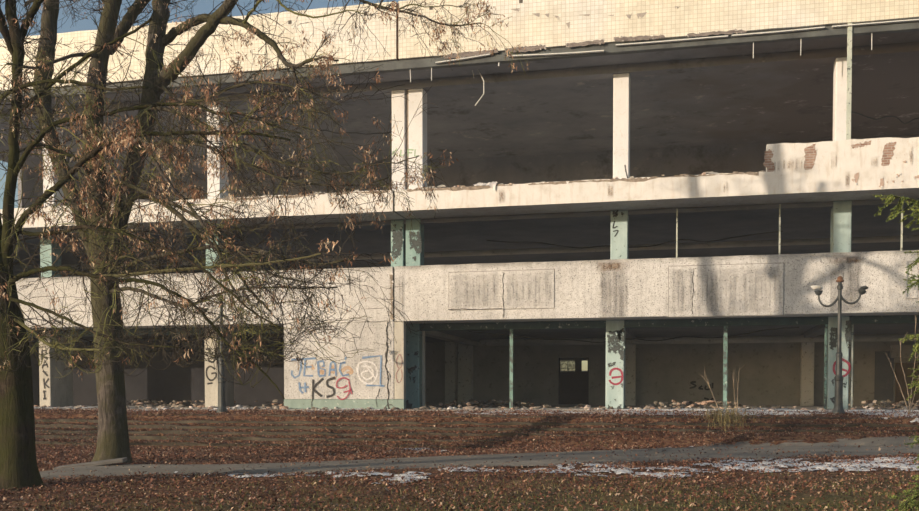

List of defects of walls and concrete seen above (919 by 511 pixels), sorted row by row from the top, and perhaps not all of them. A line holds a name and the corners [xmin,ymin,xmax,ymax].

spalling [803,144,817,170]
spalling [879,141,896,167]
peeling [390,224,422,261]
crack [341,320,393,409]
peeling [607,325,625,367]